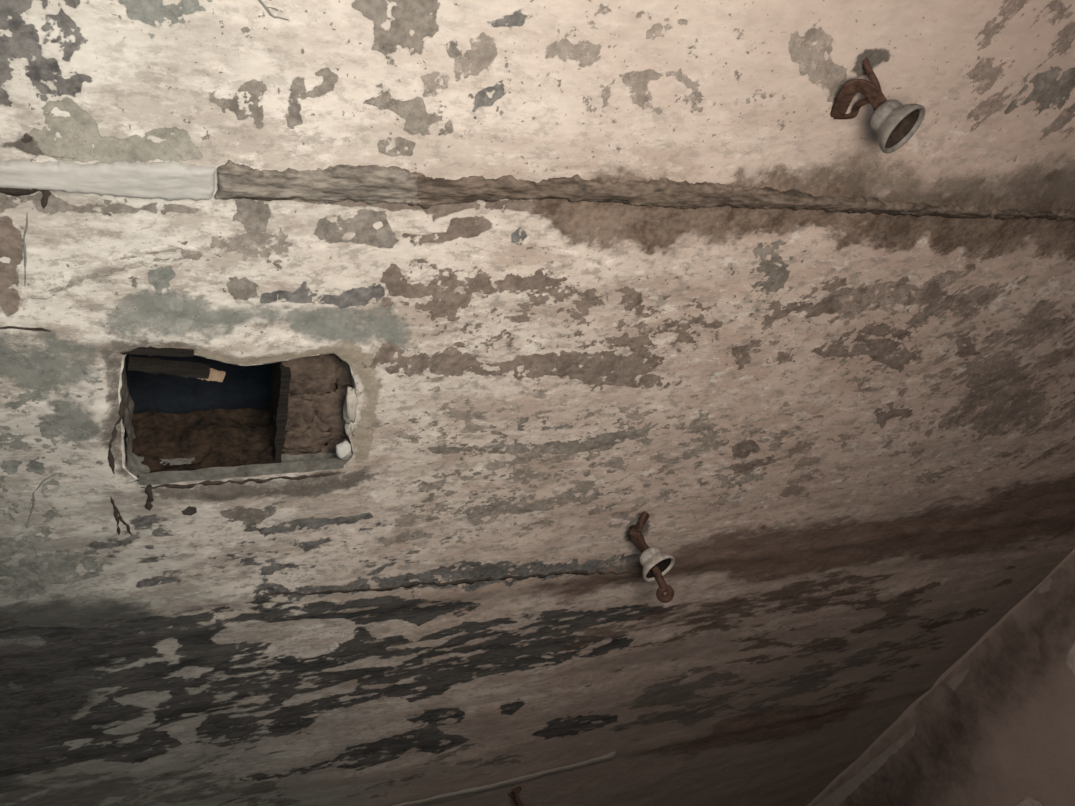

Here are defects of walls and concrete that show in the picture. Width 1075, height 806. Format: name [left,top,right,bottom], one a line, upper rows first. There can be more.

flaking render [50,0,1075,295]
crack [522,197,643,206]
water stain [530,163,1075,272]
crack [716,203,1058,220]
crack [262,570,636,596]
peeling [0,239,1075,806]
water stain [541,562,643,596]
water stain [665,476,1075,582]
water stain [0,600,153,740]